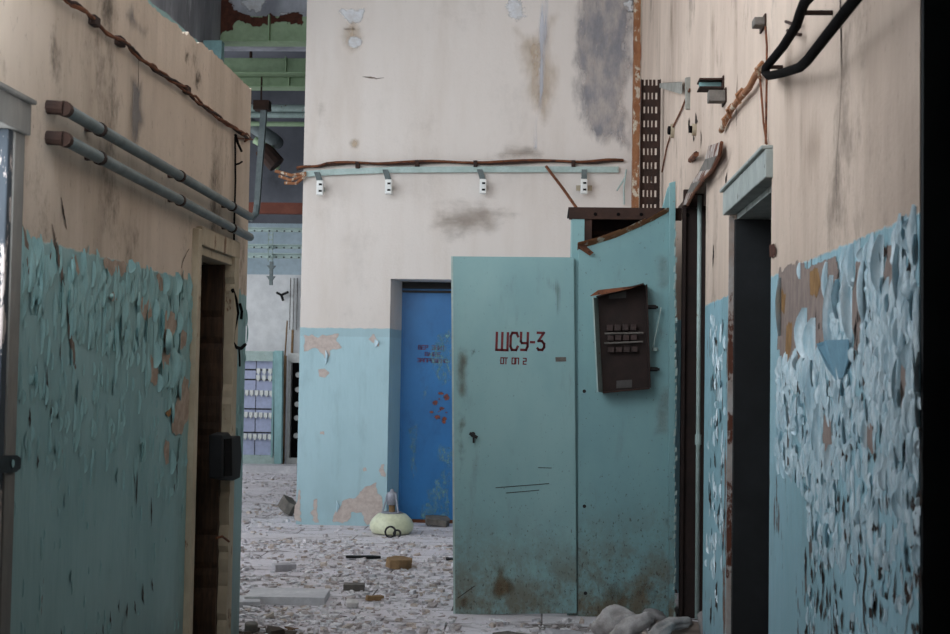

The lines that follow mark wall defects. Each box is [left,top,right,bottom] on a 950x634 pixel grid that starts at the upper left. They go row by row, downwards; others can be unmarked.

water stain [577,0,631,142]
peeling [16,226,193,561]
peeling [236,289,248,437]
peeling [294,490,319,523]
peeling [304,333,342,378]
peeling [332,464,386,525]
peeling [704,314,726,624]
peeling [772,204,923,634]